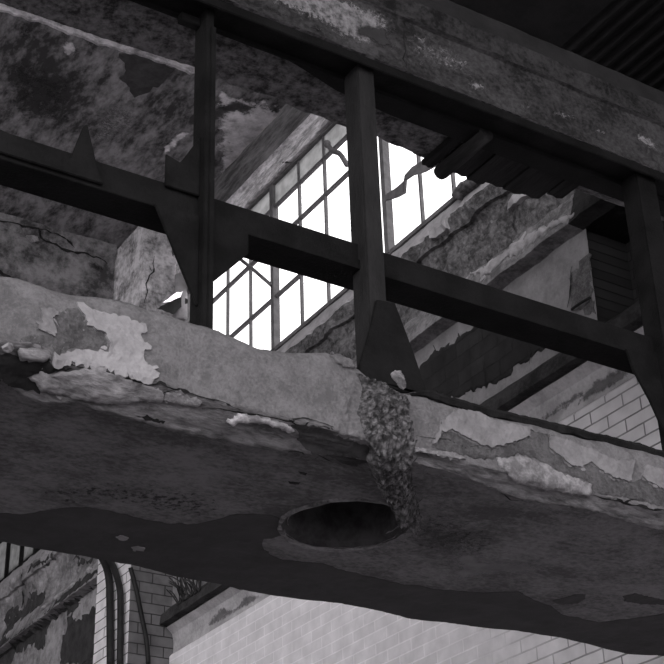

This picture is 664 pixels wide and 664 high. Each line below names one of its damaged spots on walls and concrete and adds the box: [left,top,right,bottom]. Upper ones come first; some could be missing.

peeling [0,3,195,98]
crack [0,220,107,264]
spalling [429,217,450,240]
spalling [451,179,481,201]
spalling [507,194,529,211]
spalling [466,212,574,282]
crack [144,256,155,303]
peeling [0,302,202,407]
peeling [226,413,369,467]
flaking render [415,409,664,507]
peeling [0,507,664,664]